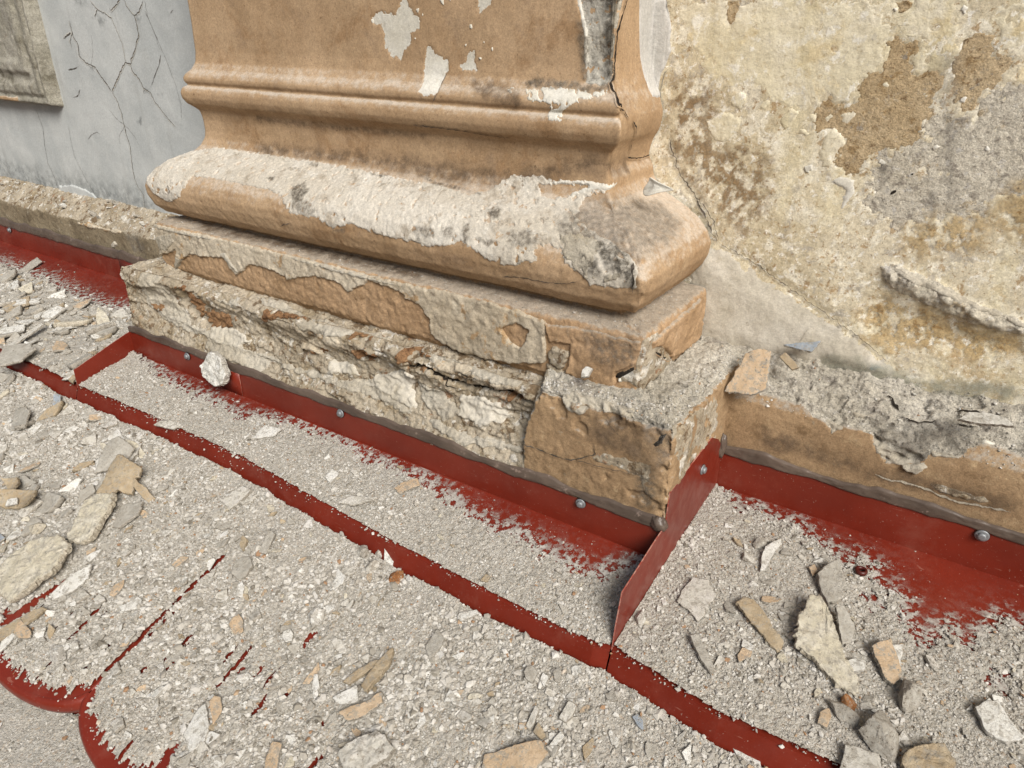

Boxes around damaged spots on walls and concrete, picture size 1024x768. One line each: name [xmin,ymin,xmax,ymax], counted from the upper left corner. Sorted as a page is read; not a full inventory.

crack [64,0,179,208]
peeling [371,0,423,60]
peeling [418,42,493,97]
peeling [478,0,491,14]
spalling [507,0,623,122]
peeling [639,0,1024,232]
peeling [146,147,638,289]
spalling [109,224,704,468]
spalling [220,486,253,510]
spalling [325,469,339,484]
spalling [592,453,651,486]
spalling [671,345,1024,479]